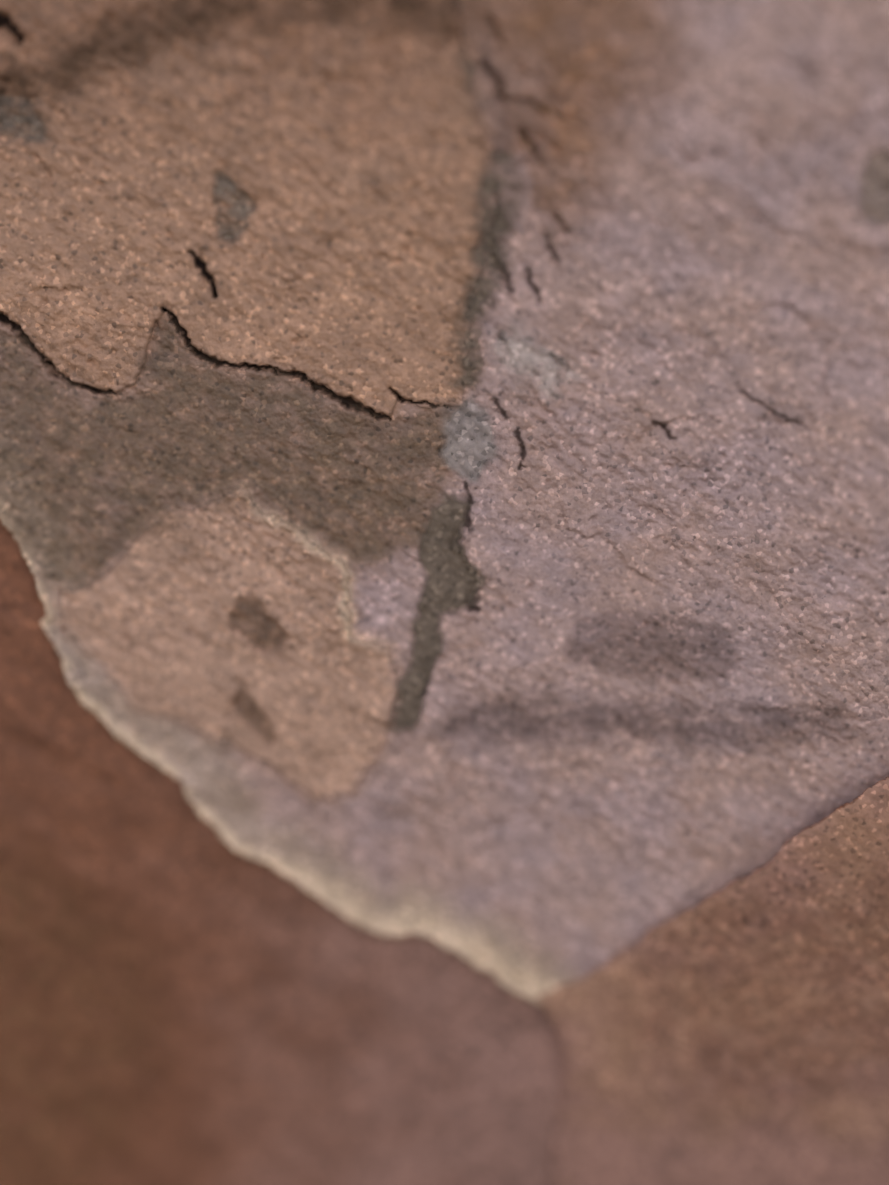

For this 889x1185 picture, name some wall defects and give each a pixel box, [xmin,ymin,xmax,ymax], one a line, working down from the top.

crack [0,13,25,43]
crack [481,15,558,162]
spalling [214,173,255,241]
crack [188,251,218,298]
crack [500,212,569,293]
crack [0,313,116,394]
crack [161,307,448,420]
crack [499,332,516,366]
crack [494,398,526,469]
crack [459,482,473,539]
crack [469,598,480,611]
spalling [0,518,547,1009]